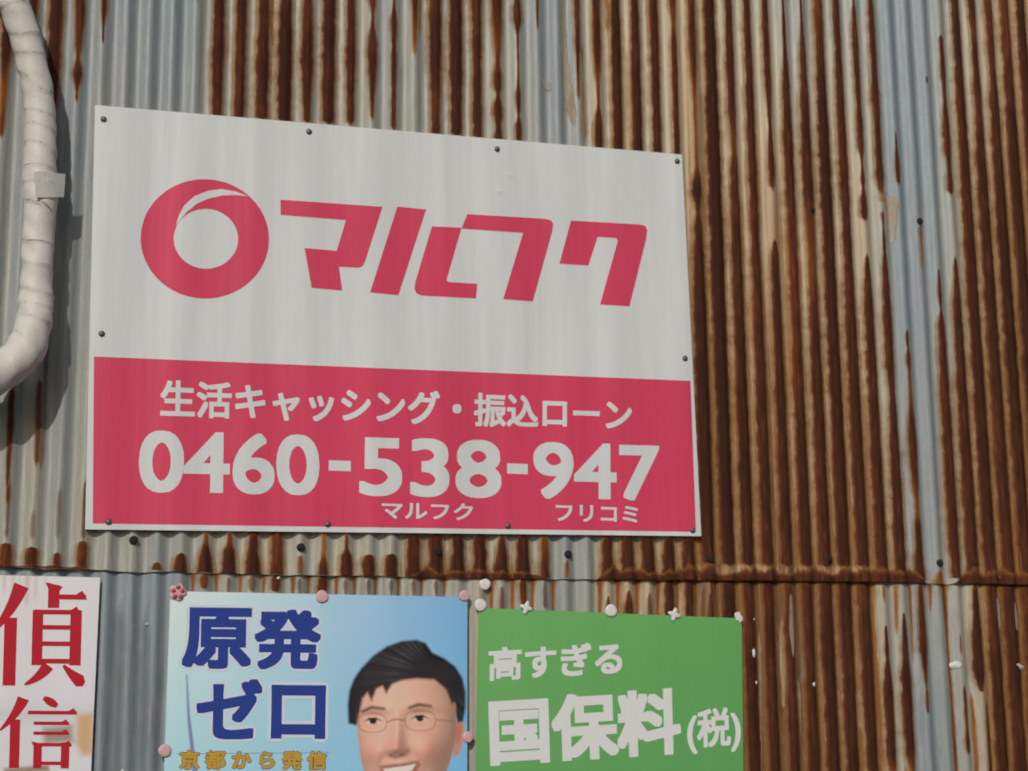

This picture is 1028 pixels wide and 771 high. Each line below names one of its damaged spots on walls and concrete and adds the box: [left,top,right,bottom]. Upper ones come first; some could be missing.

corrosion [0,18,12,137]
corrosion [29,0,86,114]
corrosion [210,0,378,126]
corrosion [390,0,398,130]
corrosion [411,0,522,141]
corrosion [6,388,15,505]
corrosion [34,380,42,464]
corrosion [573,0,1028,771]
corrosion [0,482,88,570]
corrosion [152,531,569,611]